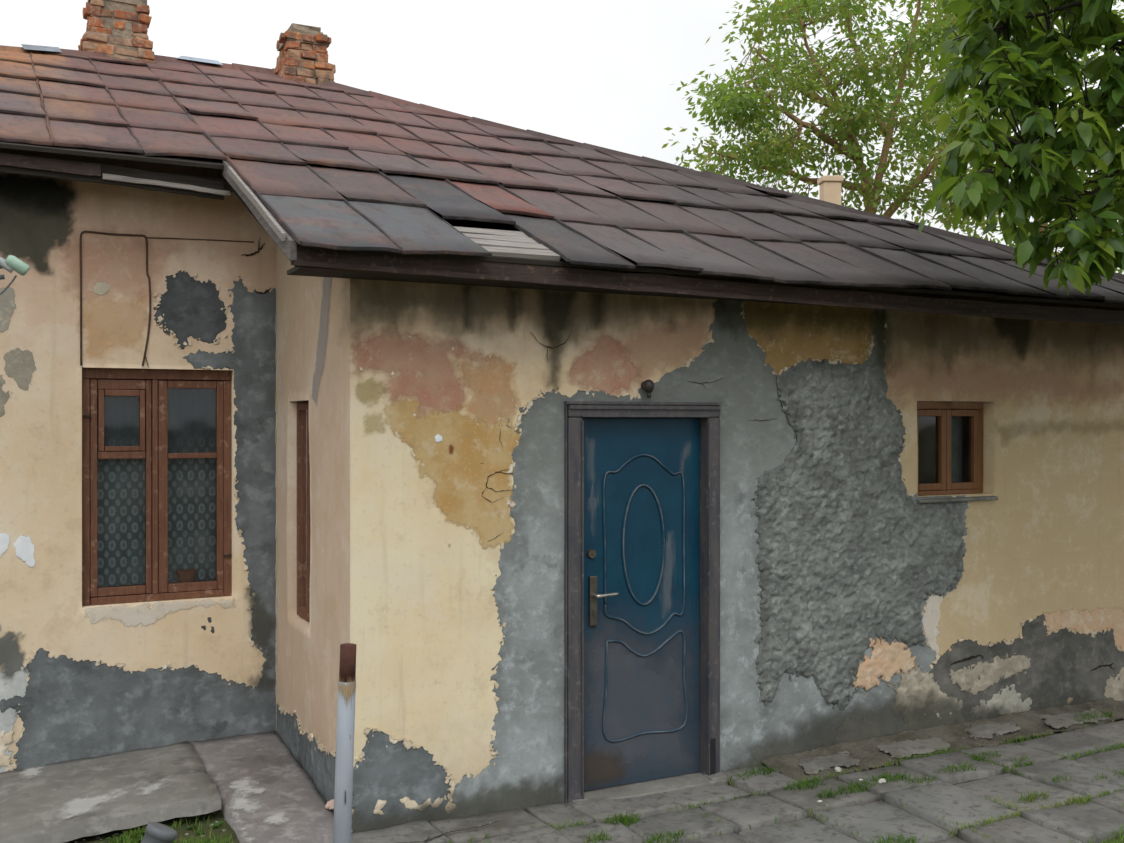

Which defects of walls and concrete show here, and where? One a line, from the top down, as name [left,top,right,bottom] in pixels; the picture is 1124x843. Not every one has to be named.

water stain [0,173,74,273]
water stain [542,292,616,383]
crack [481,421,513,503]
spalling [0,269,1124,826]